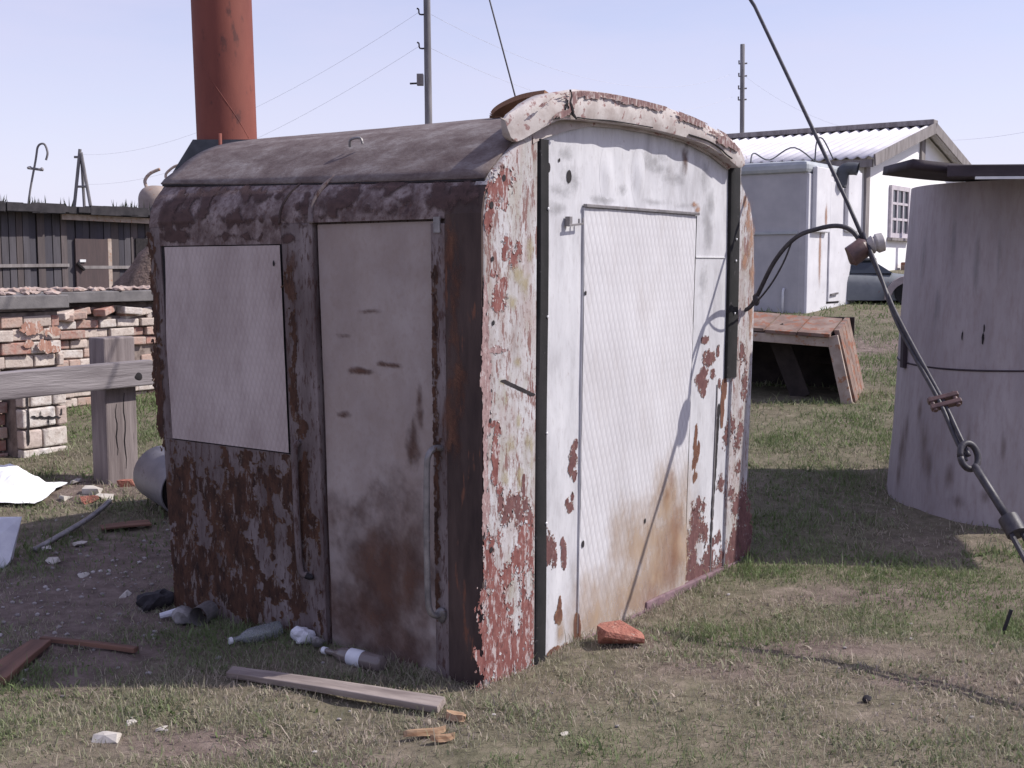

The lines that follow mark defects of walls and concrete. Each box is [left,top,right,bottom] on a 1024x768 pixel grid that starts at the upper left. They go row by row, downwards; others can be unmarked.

peeling [539,91,747,158]
peeling [484,164,517,237]
peeling [694,335,721,398]
peeling [739,341,749,403]
corrosion [146,180,479,666]
peeling [473,236,535,691]
peeling [565,438,578,514]
peeling [685,415,753,581]
peeling [547,527,567,569]
corrosion [547,483,690,657]